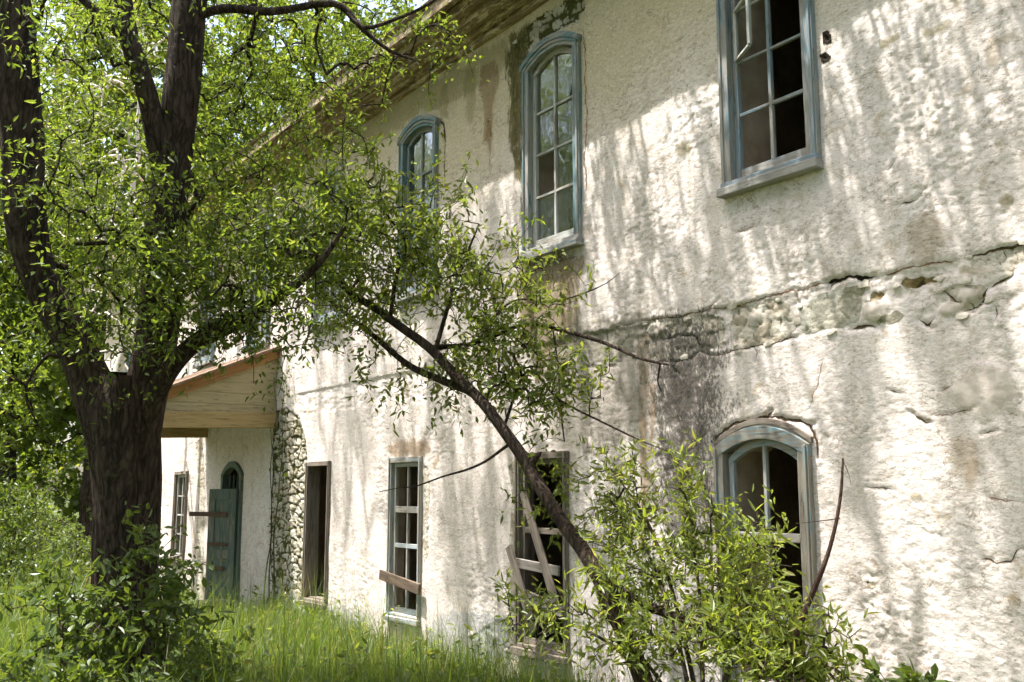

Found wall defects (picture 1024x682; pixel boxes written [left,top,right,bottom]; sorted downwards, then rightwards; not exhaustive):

leakage [506,47,522,240]
spalling [558,238,1024,362]
crack [614,244,1023,370]
leakage [635,305,741,557]